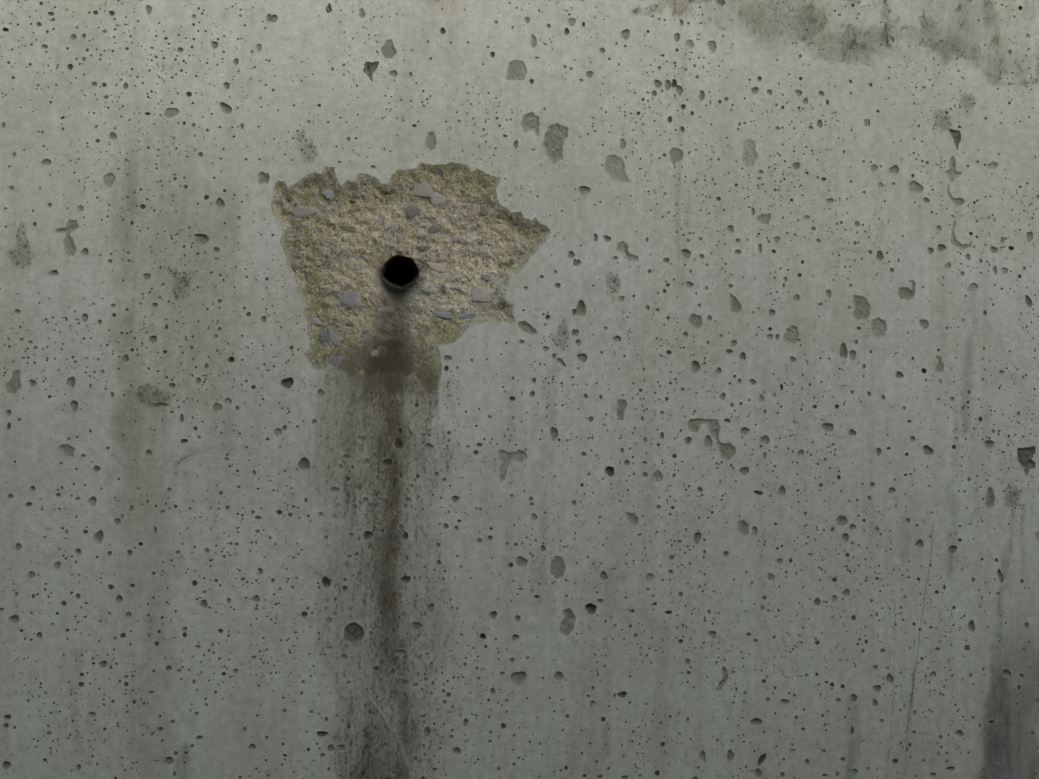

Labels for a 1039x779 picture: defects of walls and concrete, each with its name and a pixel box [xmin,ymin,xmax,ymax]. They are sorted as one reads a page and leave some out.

spalling [258,131,551,394]
spalling [542,339,588,367]
spalling [576,300,586,317]
damp [320,300,437,779]